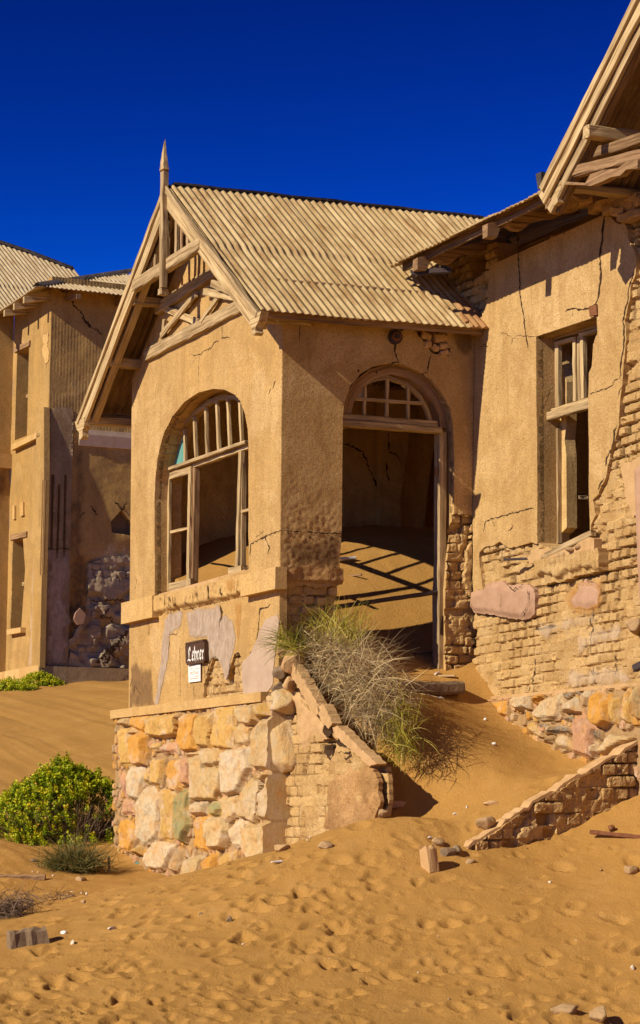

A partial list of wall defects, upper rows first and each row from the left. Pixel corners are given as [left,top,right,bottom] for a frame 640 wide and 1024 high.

crack [60,290,102,335]
crack [477,232,534,350]
crack [566,218,604,316]
crack [591,274,633,395]
crack [343,433,401,487]
crack [598,426,617,489]
crack [249,530,341,555]
crack [453,508,531,531]
spalling [68,556,130,668]